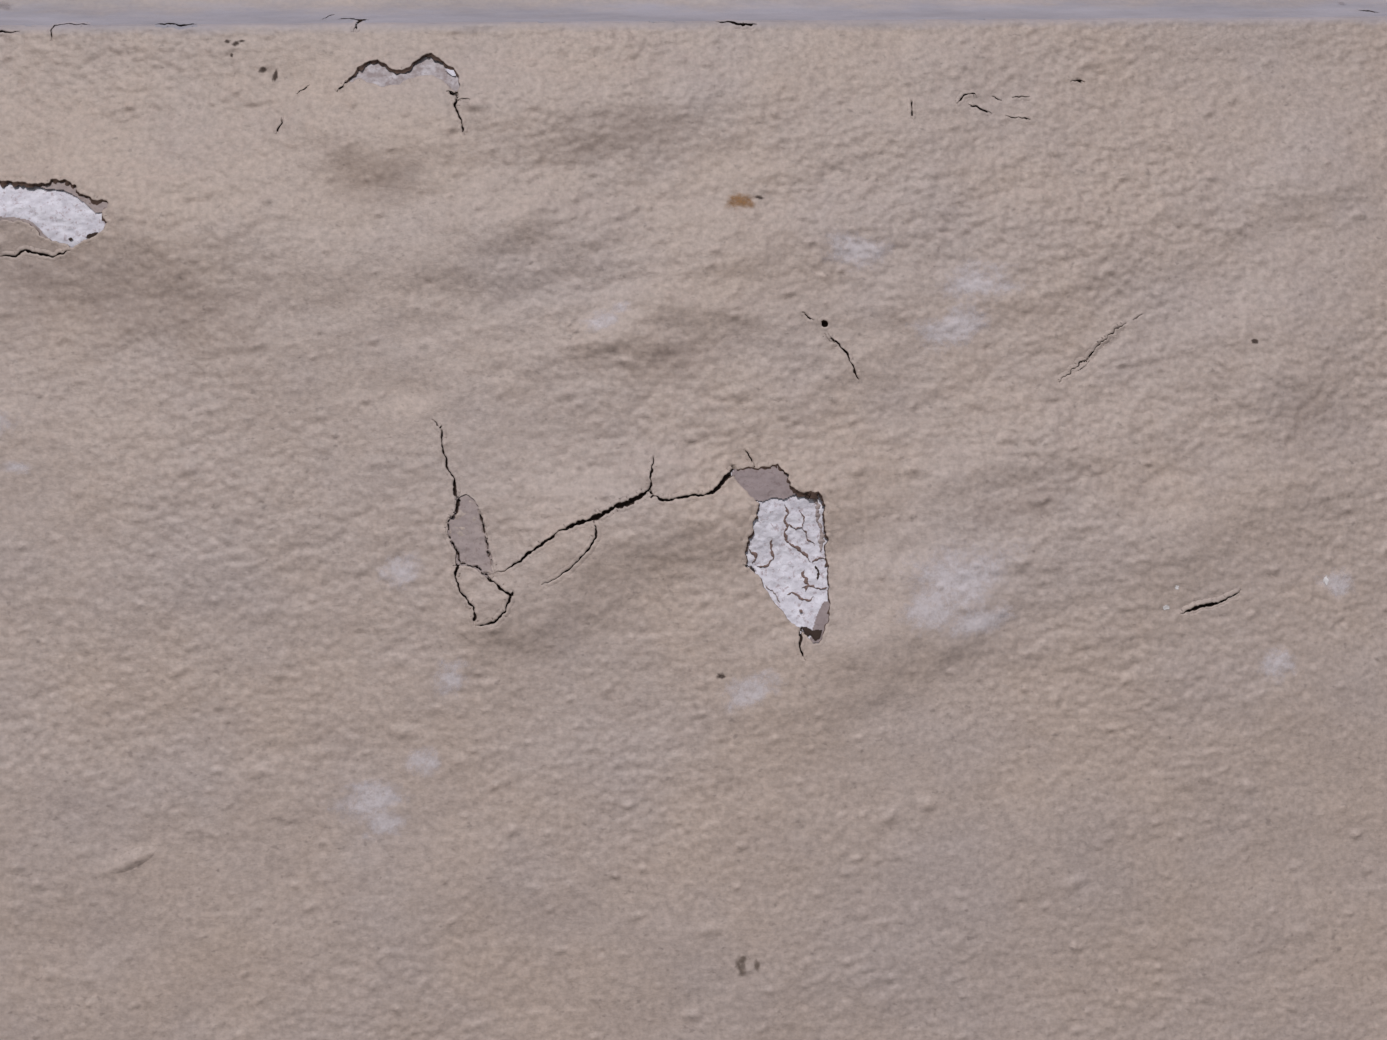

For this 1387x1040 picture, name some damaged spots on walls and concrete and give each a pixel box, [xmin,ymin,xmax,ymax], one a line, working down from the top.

peeling [273,116,287,136]
peeling [334,49,471,137]
peeling [0,175,113,262]
crack [801,308,863,383]
crack [494,455,735,589]
peeling [728,447,835,663]